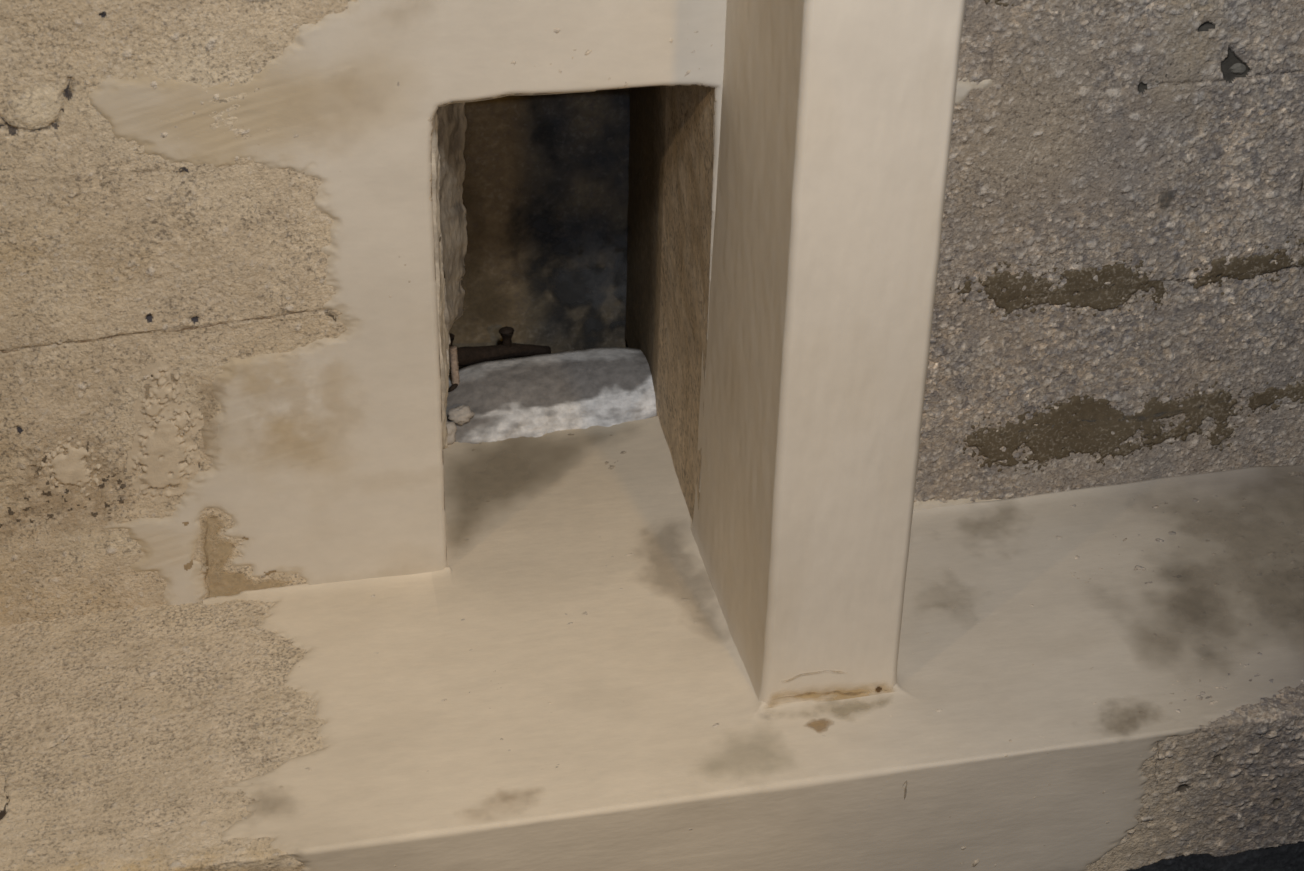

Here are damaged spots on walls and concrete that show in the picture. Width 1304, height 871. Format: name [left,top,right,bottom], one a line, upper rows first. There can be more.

crack [78,311,336,343]
spalling [949,259,1170,317]
spalling [1190,235,1304,295]
spalling [955,376,1304,475]
peeling [184,517,280,598]
leakage [1170,484,1304,631]